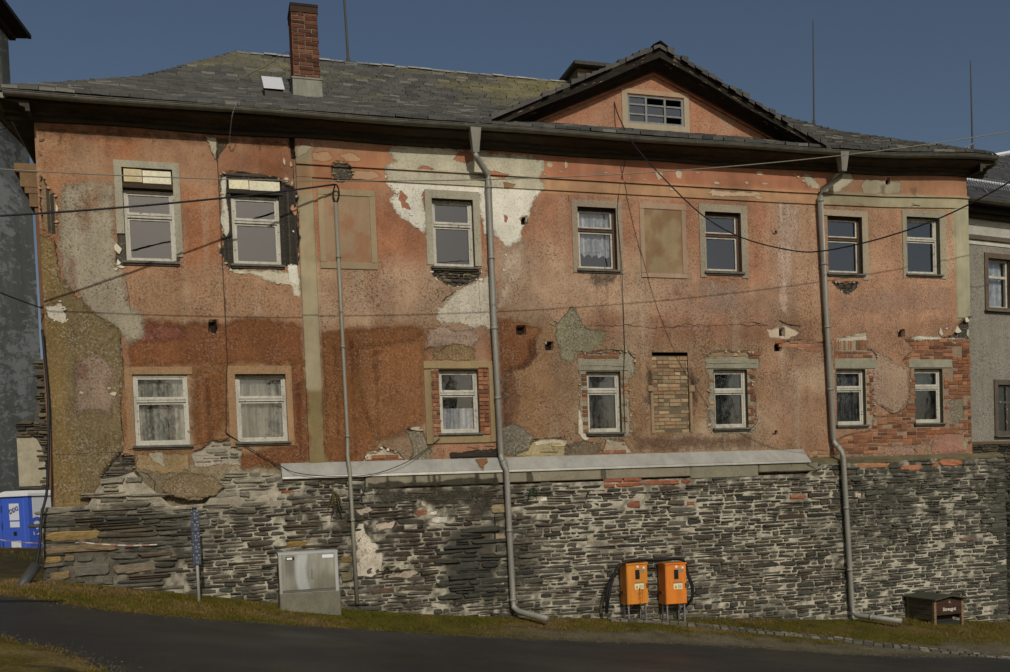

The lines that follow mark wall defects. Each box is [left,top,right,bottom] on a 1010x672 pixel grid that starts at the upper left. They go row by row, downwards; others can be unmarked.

flaking render [205,135,228,160]
peeling [38,177,144,349]
peeling [218,139,568,329]
flaking render [577,349,638,454]
flaking render [704,350,761,435]
flaking render [774,316,972,458]
flaking render [100,439,242,491]
flaking render [363,447,407,461]
flaking render [517,436,567,457]